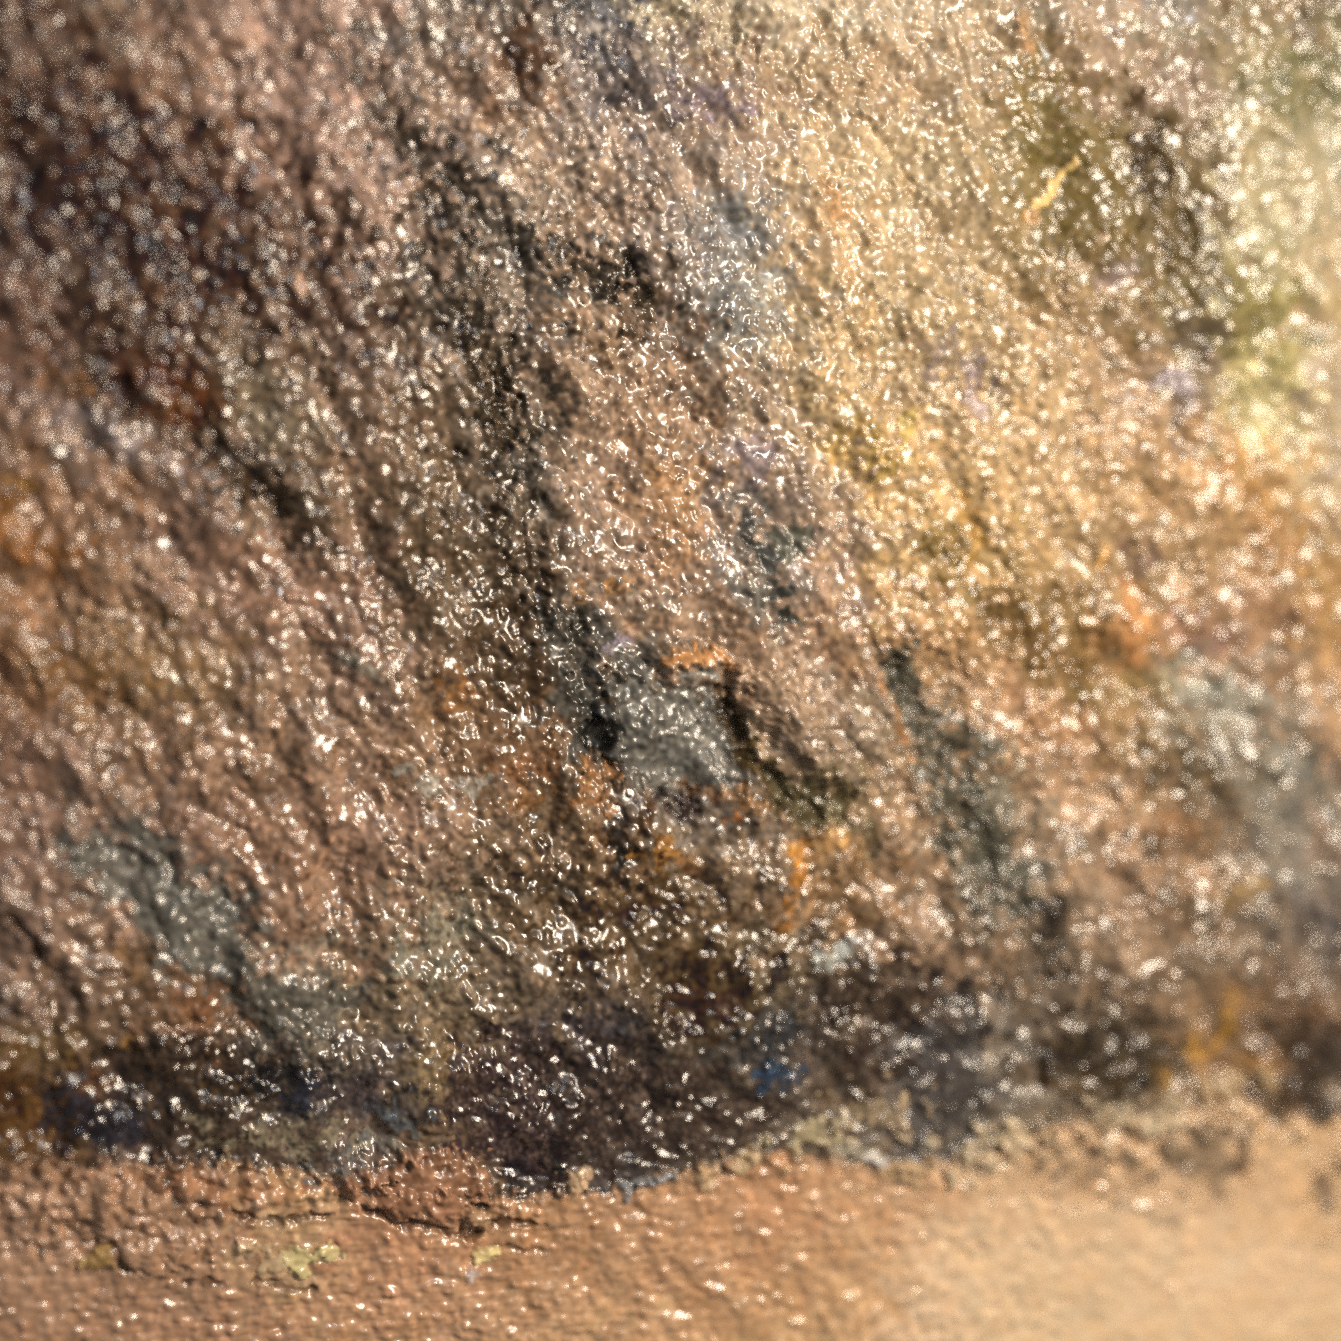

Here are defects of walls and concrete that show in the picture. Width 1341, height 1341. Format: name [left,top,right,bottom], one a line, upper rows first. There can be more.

damp [391,763,493,801]
damp [38,942,1063,1200]
damp [1038,984,1189,1152]
damp [1202,1007,1341,1125]